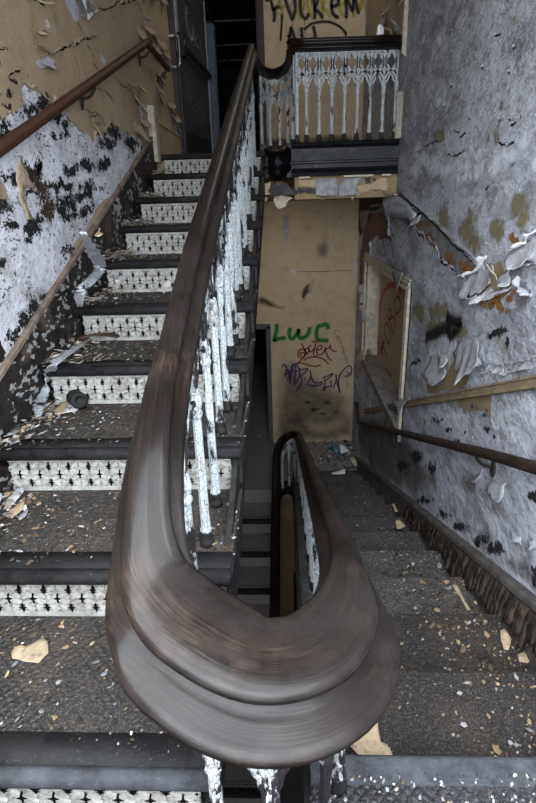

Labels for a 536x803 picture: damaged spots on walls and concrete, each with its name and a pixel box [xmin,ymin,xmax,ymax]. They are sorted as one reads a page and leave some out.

peeling [38,0,99,22]
peeling [0,15,182,365]
flaking render [265,174,416,305]
crack [398,192,476,277]
peeling [456,229,536,308]
peeling [423,337,536,394]
peeling [4,486,29,520]
peeling [469,468,505,503]
peeling [392,503,536,663]